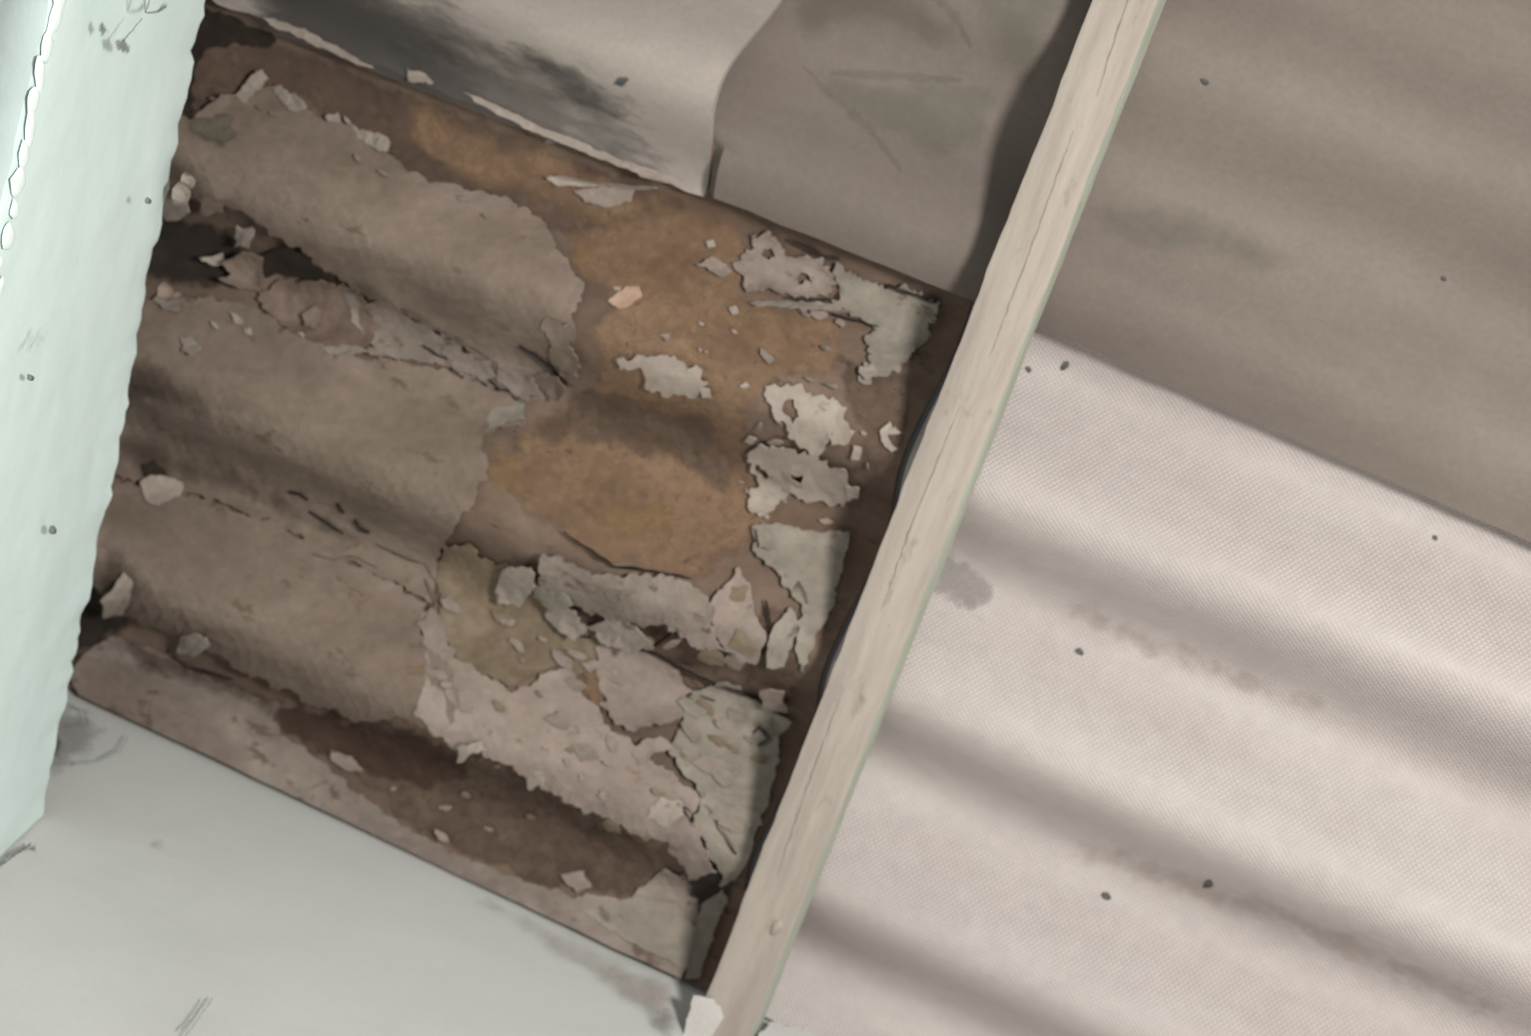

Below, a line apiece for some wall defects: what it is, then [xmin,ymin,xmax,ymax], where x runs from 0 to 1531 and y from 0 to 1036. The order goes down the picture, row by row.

peeling [261,16,374,68]
damp [191,43,679,232]
peeling [70,68,792,979]
rust [499,203,836,575]
peeling [696,230,940,385]
peeling [738,377,905,672]